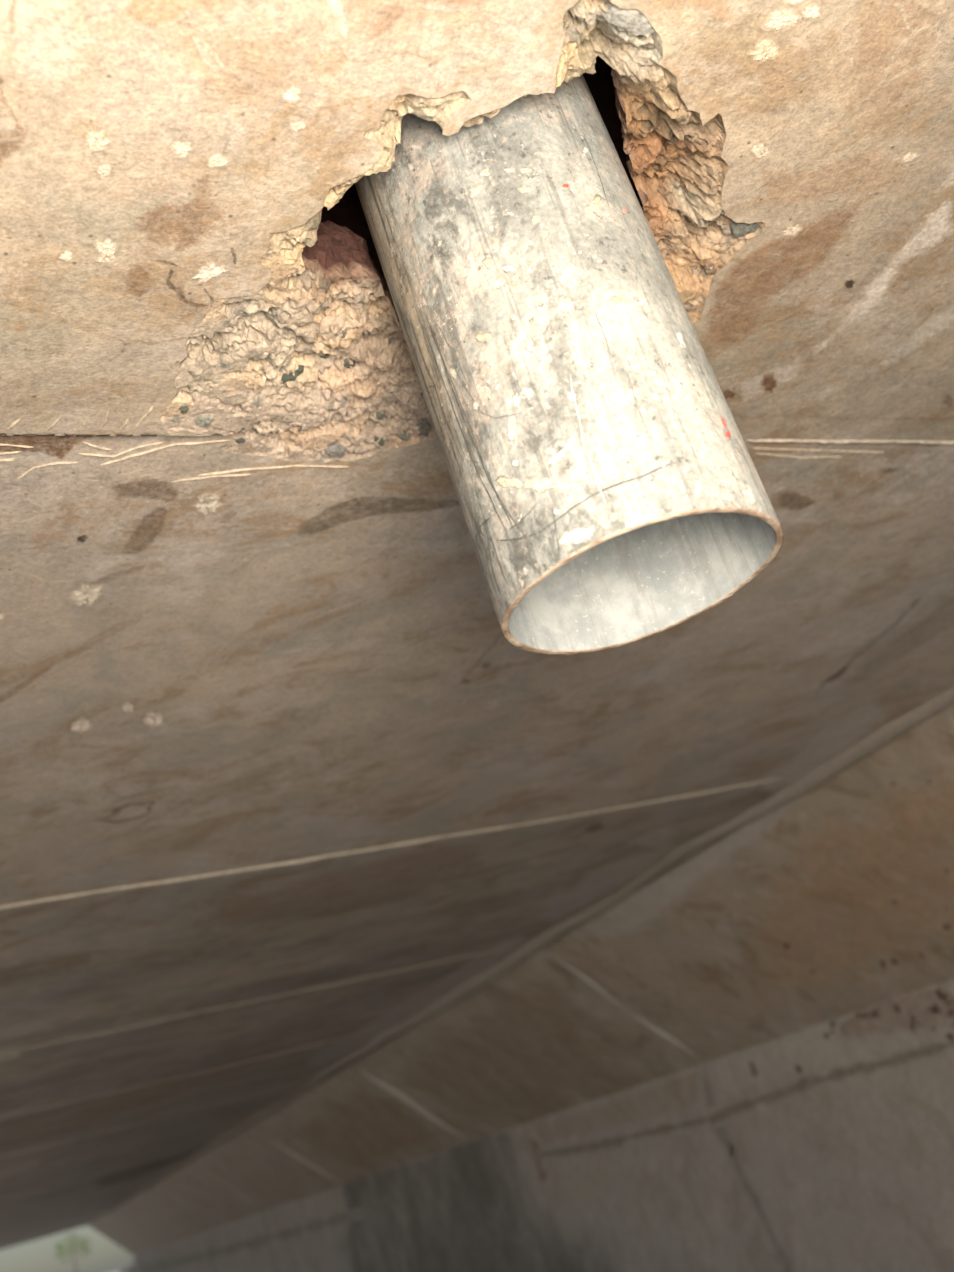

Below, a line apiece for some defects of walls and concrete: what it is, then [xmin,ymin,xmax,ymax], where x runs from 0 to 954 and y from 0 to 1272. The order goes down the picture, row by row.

spalling [281,84,303,104]
spalling [750,141,773,161]
spalling [555,0,766,324]
spalling [780,223,803,238]
spalling [158,91,501,463]